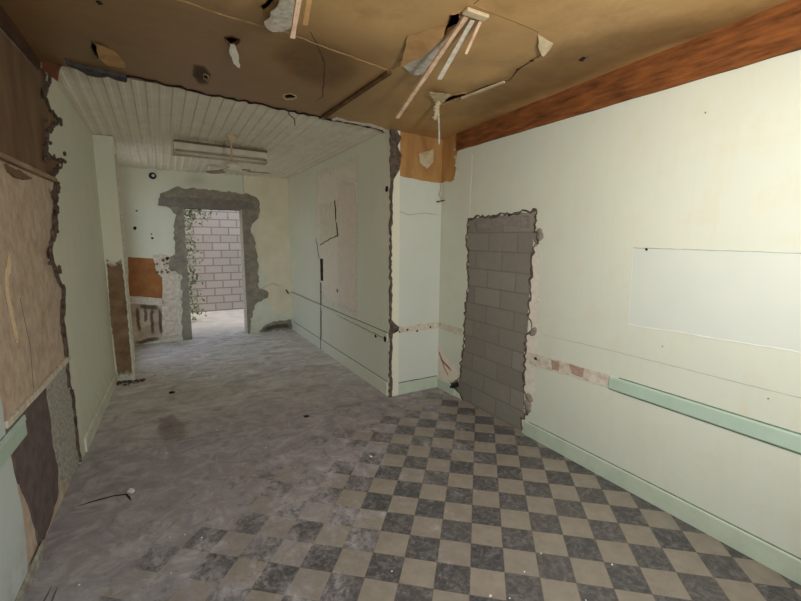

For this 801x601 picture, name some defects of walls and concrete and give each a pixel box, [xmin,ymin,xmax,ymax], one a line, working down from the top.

peeling [264,0,295,32]
spalling [64,44,127,83]
spalling [41,74,82,485]
spalling [153,254,171,277]
spalling [315,117,610,430]